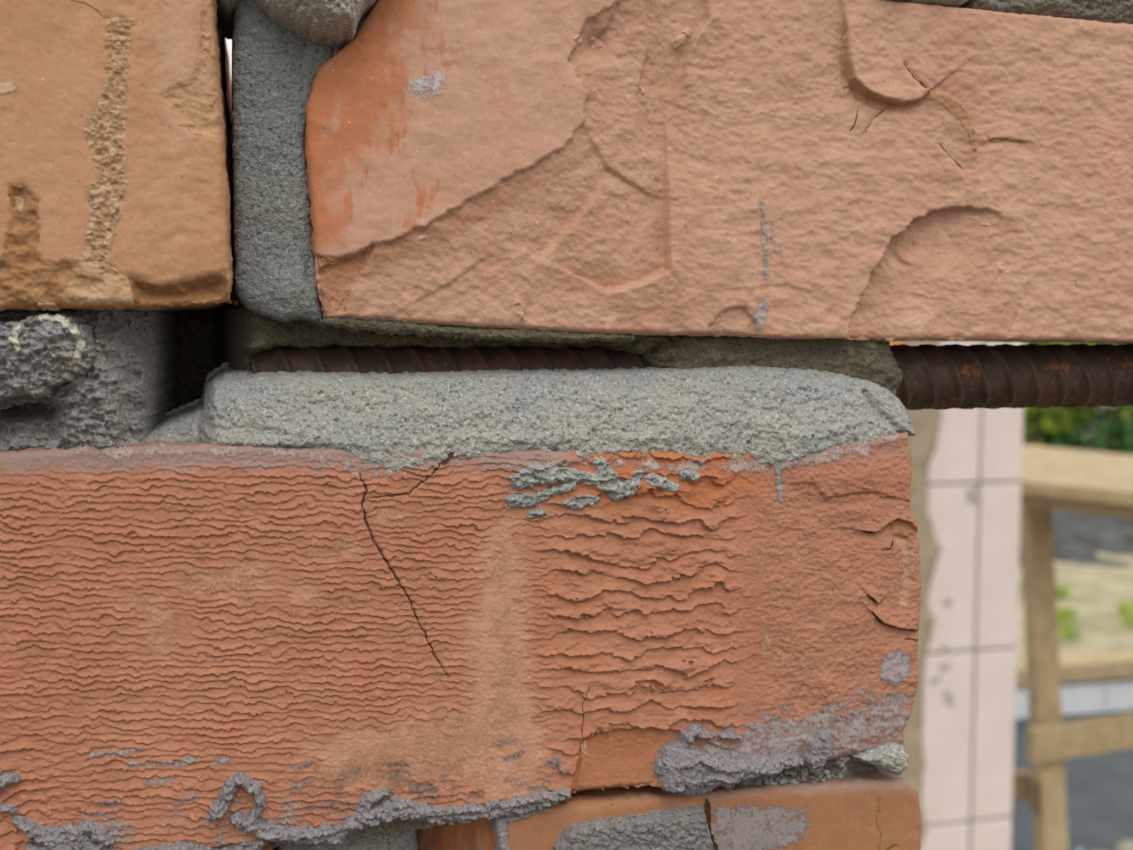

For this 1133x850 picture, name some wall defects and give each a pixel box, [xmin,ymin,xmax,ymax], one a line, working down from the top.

spalling [0,0,232,310]
spalling [316,0,758,338]
crack [849,110,884,133]
spalling [848,206,1034,342]
crack [359,451,454,676]
crack [705,798,718,850]